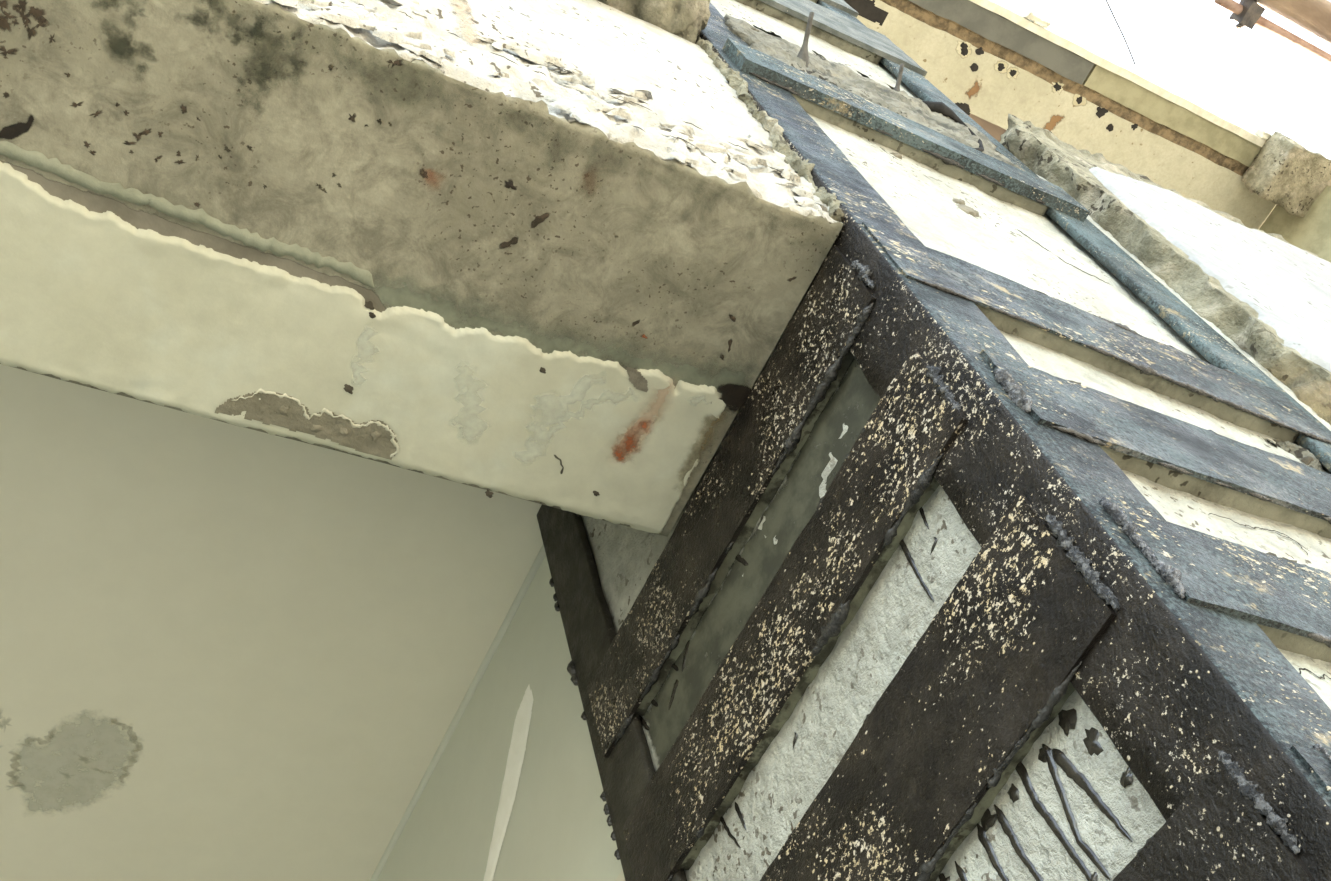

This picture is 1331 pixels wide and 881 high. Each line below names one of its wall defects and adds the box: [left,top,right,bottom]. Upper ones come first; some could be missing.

spalling [0,0,55,43]
leakage [99,0,151,72]
leakage [193,0,304,89]
spalling [123,129,163,154]
spalling [273,0,828,219]
peeling [881,0,1249,176]
peeling [1,161,386,319]
spalling [531,213,549,228]
spalling [215,389,400,460]
rust [614,389,667,461]
spalling [1265,438,1327,473]
crack [1299,668,1331,679]